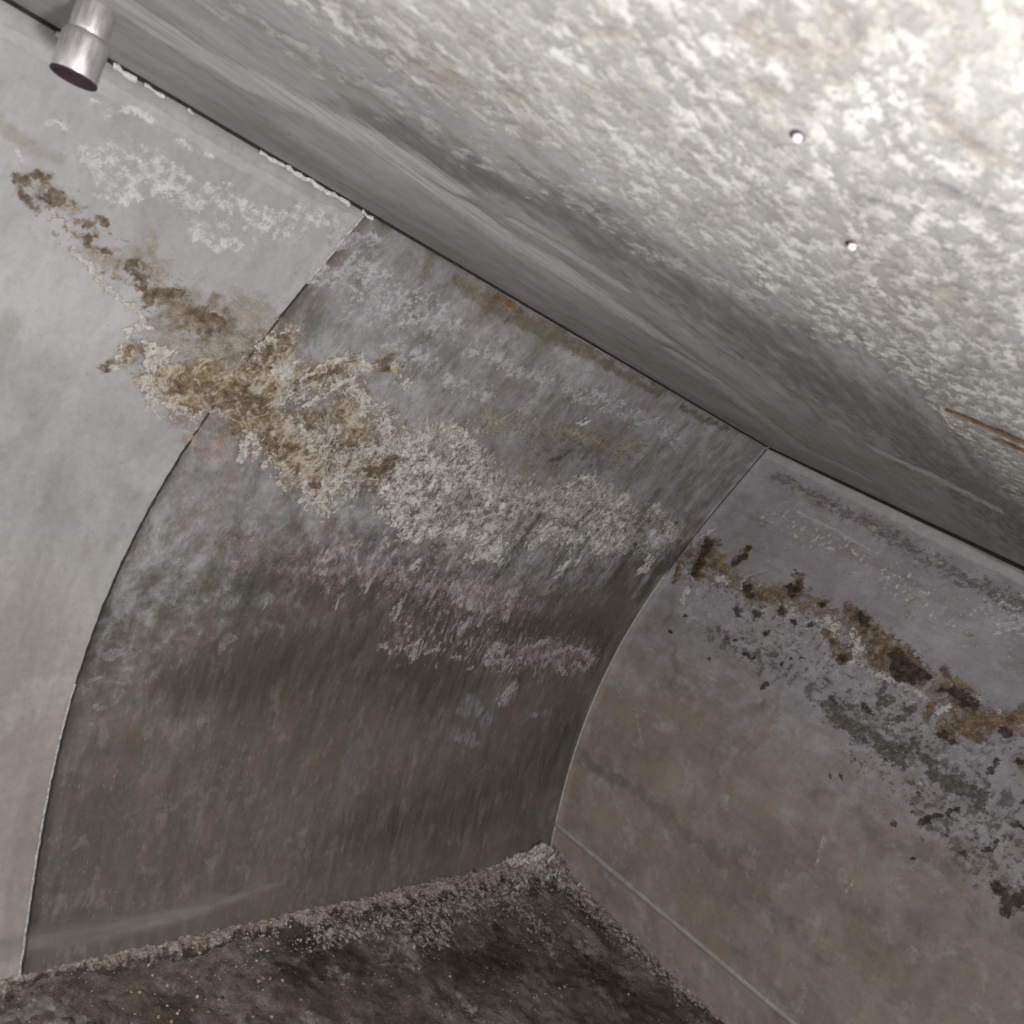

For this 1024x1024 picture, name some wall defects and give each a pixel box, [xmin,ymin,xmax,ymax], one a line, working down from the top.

efflorescence [88,98,156,124]
efflorescence [27,117,688,747]
leakage [112,0,1024,546]
rust [944,410,1024,453]